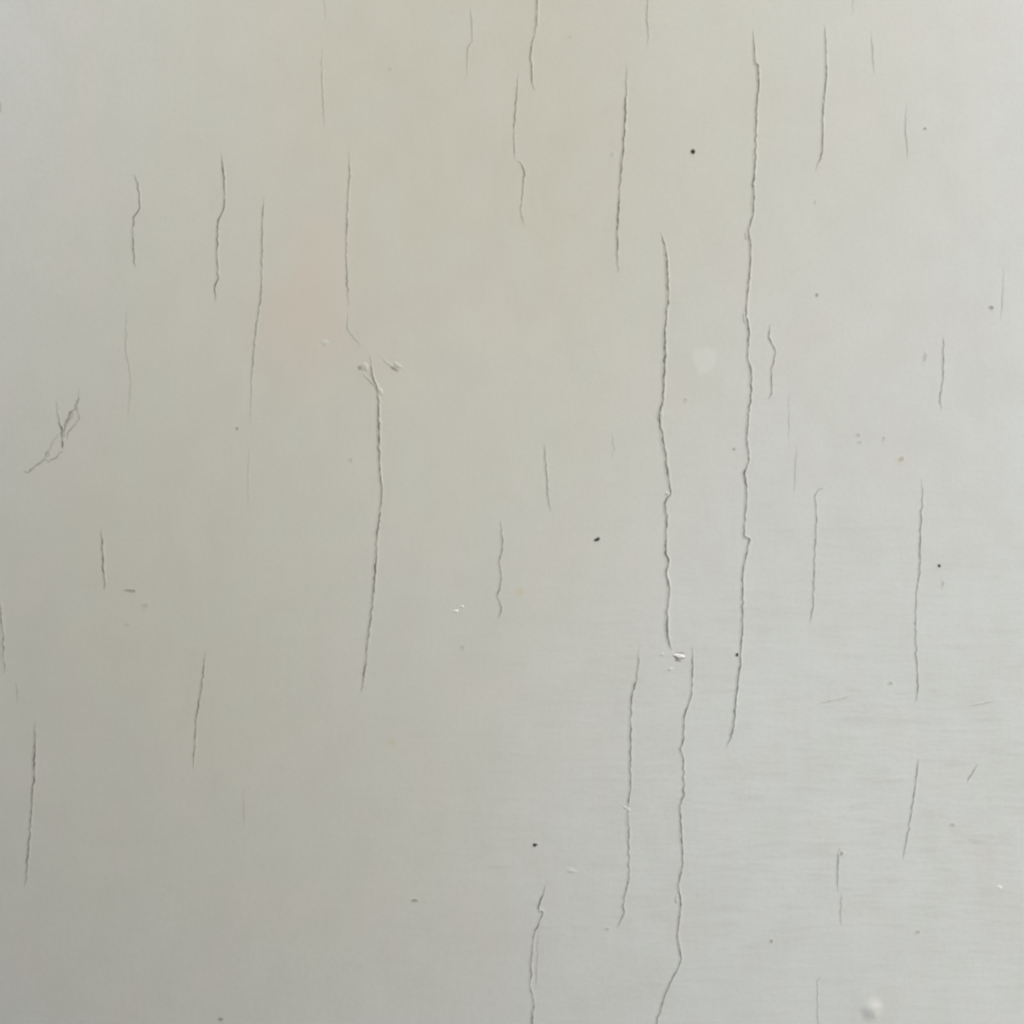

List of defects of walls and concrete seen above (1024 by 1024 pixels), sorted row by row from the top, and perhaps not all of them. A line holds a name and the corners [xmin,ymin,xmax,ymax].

crack [213,152,227,302]
crack [512,0,540,226]
crack [615,62,629,273]
crack [815,25,829,172]
crack [344,150,393,694]
crack [726,30,824,749]
crack [654,232,695,1024]
crack [913,478,925,703]
crack [0,601,38,890]
crack [616,648,641,928]
crack [902,758,919,859]
crack [528,886,546,1024]